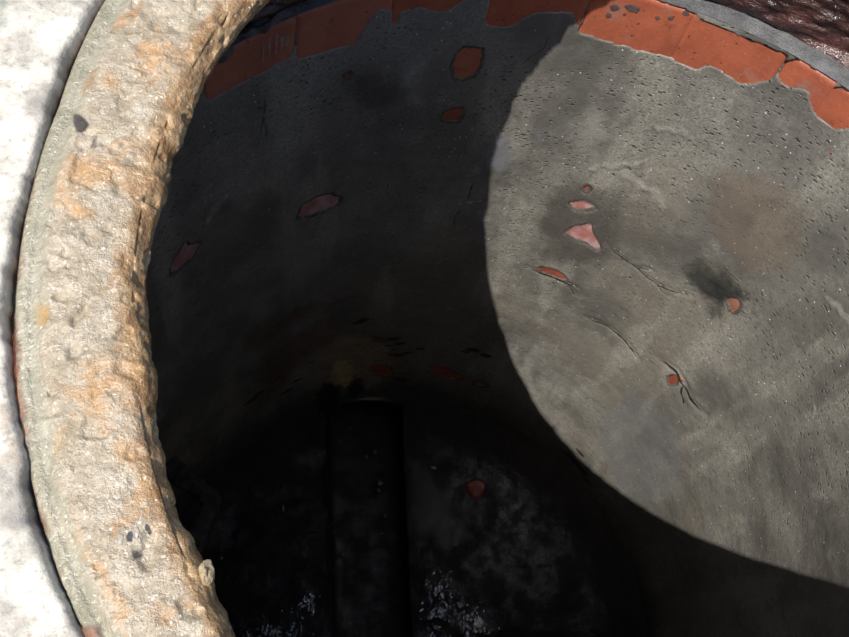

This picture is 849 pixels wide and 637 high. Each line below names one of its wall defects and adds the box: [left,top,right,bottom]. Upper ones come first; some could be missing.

peeling [217,43,235,64]
spalling [450,46,485,81]
spalling [568,184,597,212]
spalling [563,223,607,251]
spalling [536,266,568,283]
crack [530,268,574,294]
crack [613,250,679,296]
damp [688,268,744,304]
spalling [725,296,742,314]
crack [592,320,635,354]
crack [662,361,701,411]